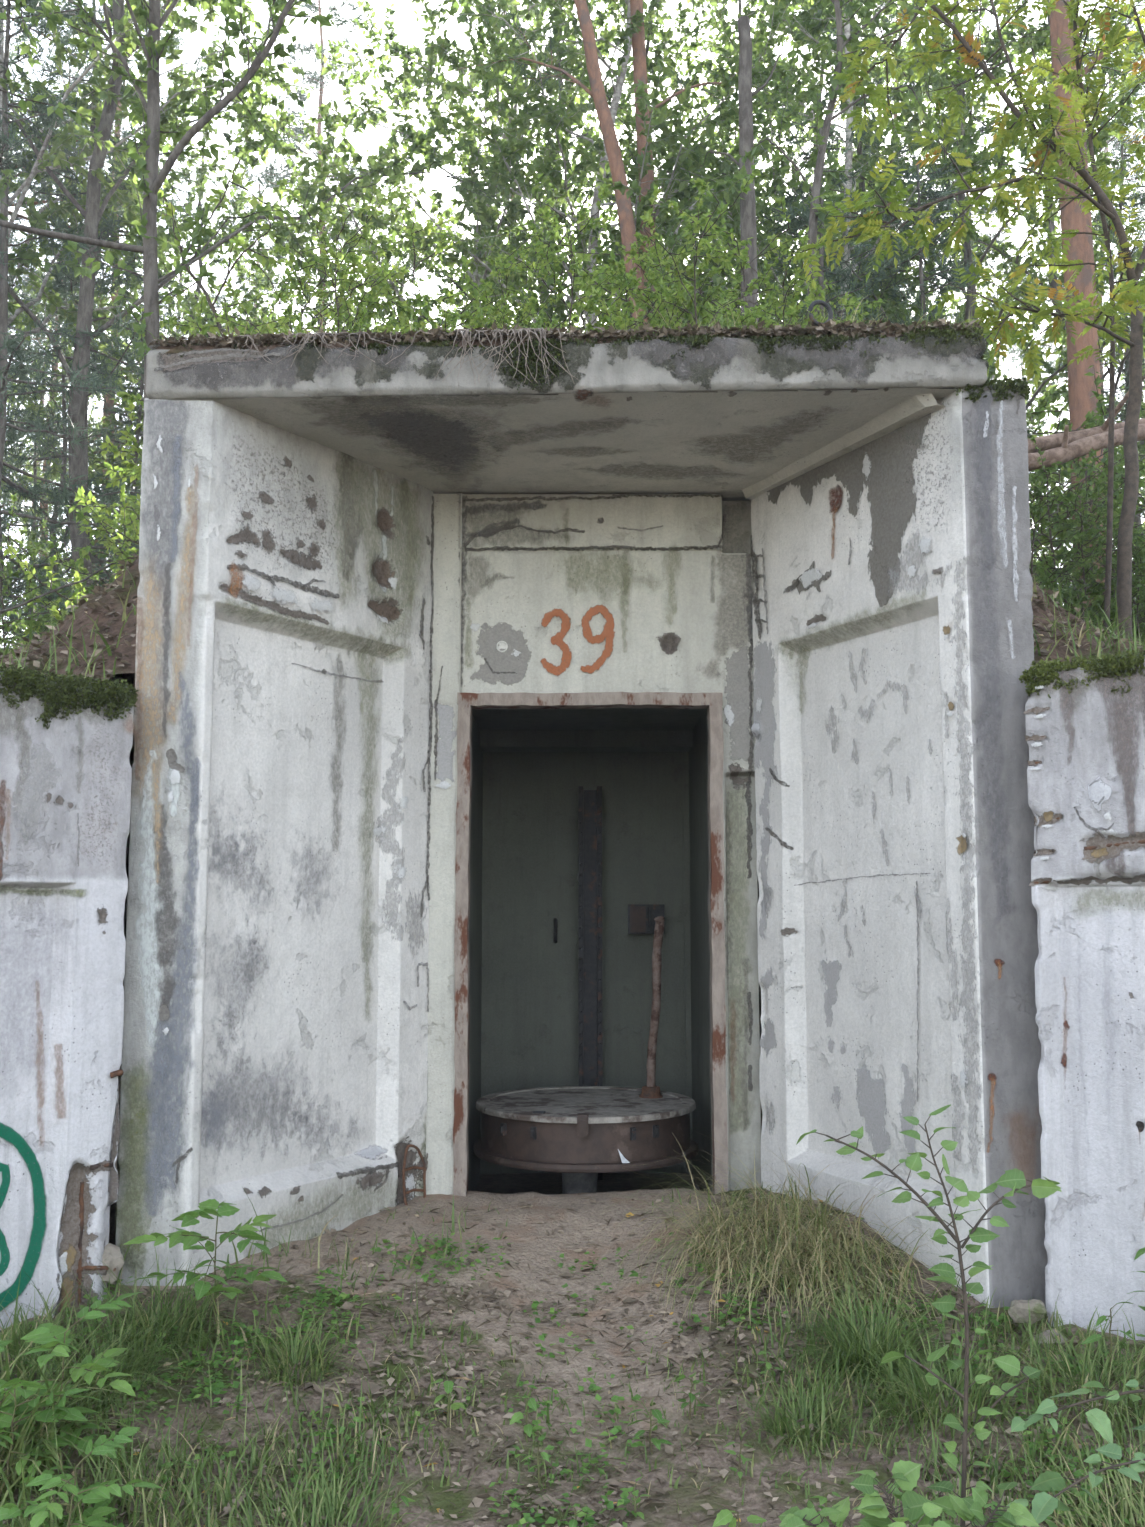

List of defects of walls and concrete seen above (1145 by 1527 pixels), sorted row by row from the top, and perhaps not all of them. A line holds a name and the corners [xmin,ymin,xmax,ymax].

spalling [220,448,335,625]
spalling [377,507,396,540]
corrosion [829,485,843,559]
spalling [368,557,403,624]
spalling [470,622,531,686]
damp [137,345,413,1215]
peeling [767,401,983,1168]
spalling [1034,811,1063,828]
damp [1043,669,1145,836]
spalling [1029,829,1145,891]
peeling [759,1018,777,1056]
spalling [55,1069,124,1317]